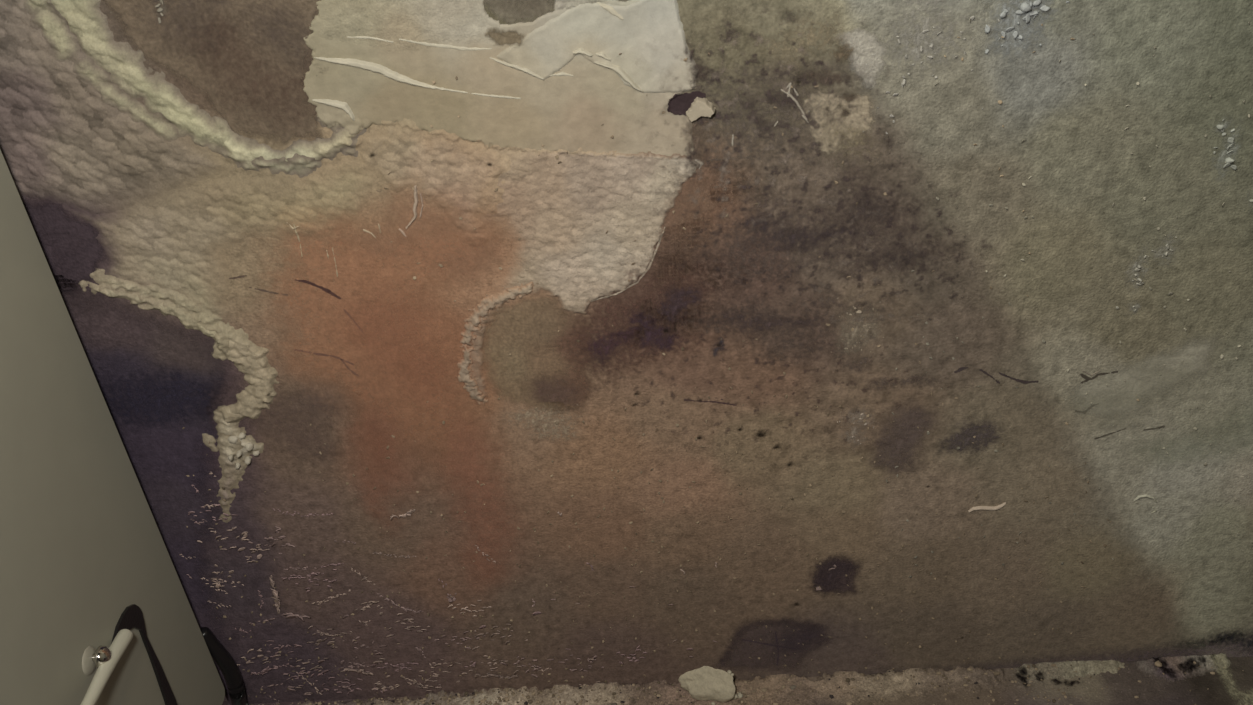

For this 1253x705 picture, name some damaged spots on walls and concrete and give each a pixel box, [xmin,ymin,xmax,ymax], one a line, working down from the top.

damp [970,0,1051,54]
peeling [303,0,716,249]
damp [484,13,957,438]
damp [942,422,999,451]
peeling [186,484,333,607]
peeling [235,563,603,702]
damp [721,621,824,670]
damp [814,557,859,593]